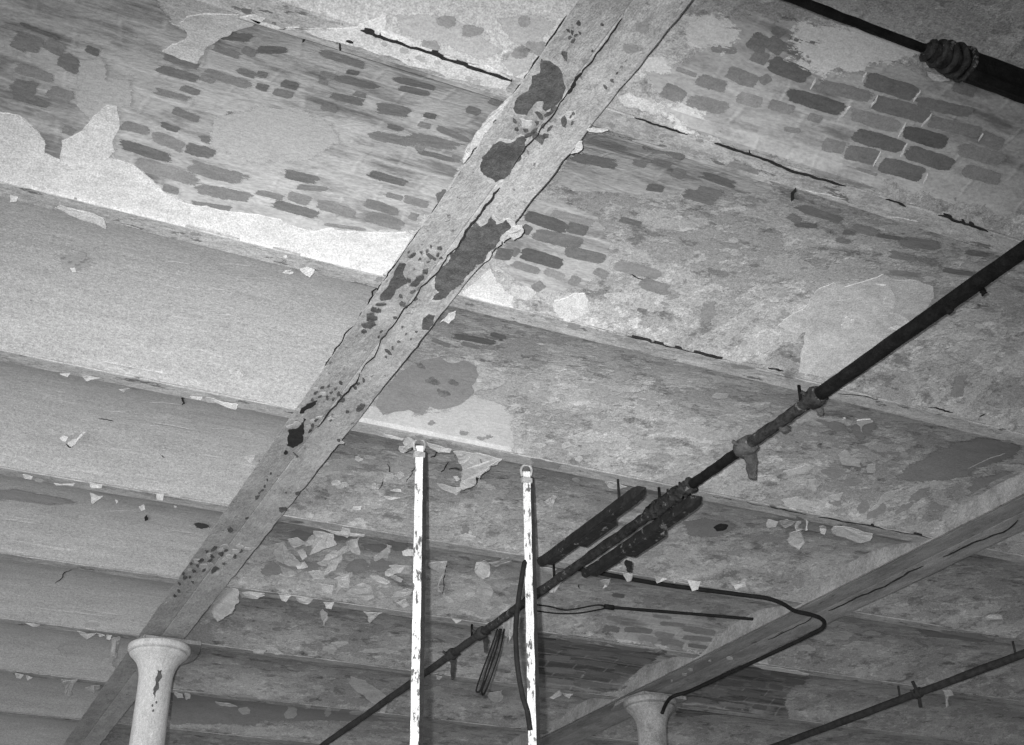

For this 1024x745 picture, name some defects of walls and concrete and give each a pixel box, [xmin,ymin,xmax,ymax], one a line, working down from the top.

flaking render [0,0,507,232]
crack [606,117,846,187]
flaking render [494,9,1024,297]
crack [318,15,622,427]
crack [938,213,988,232]
crack [529,314,783,371]
spalling [376,311,507,495]
flaking render [766,450,941,550]
peeling [211,587,265,622]
peeling [261,527,414,624]
peeling [475,558,514,643]
crack [713,496,1018,640]